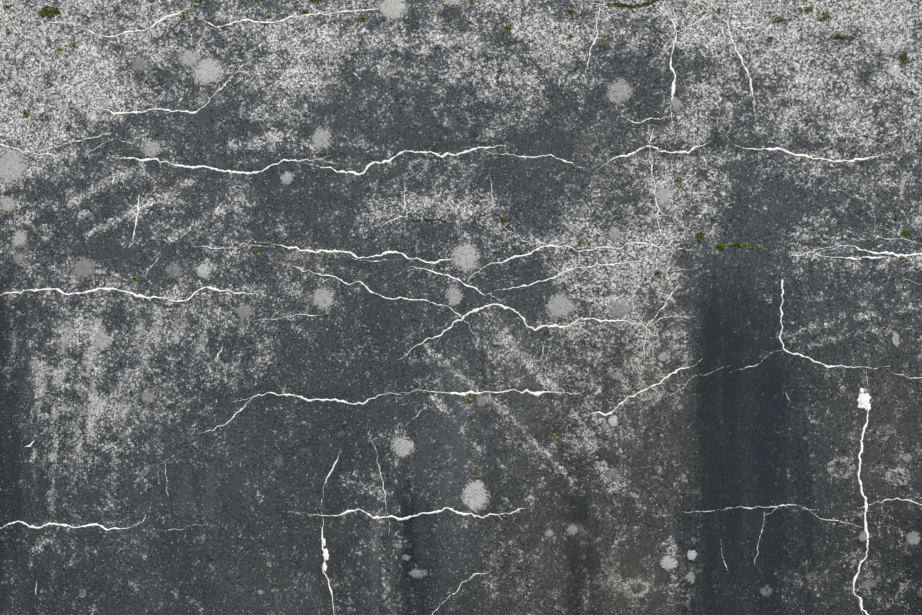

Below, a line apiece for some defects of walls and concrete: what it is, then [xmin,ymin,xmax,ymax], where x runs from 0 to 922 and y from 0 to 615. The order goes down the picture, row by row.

crack [0,0,922,360]
crack [0,516,146,531]
crack [203,389,585,433]
crack [281,436,525,612]
crack [577,279,922,615]
leakage [856,388,871,412]